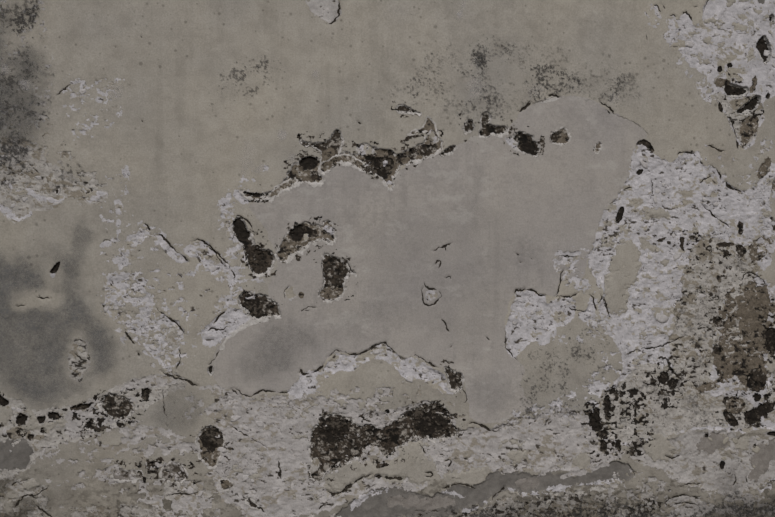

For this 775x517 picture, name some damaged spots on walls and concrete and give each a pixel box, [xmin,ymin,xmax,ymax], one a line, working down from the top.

water stain [0,0,39,33]
peeling [301,0,342,24]
water stain [0,52,39,172]
peeling [0,81,112,224]
peeling [58,73,125,141]
spalling [391,100,422,118]
spalling [459,119,475,135]
peeling [663,0,775,151]
peeling [100,182,129,248]
peeling [112,220,189,270]
water stain [0,262,108,398]
peeling [67,337,91,383]